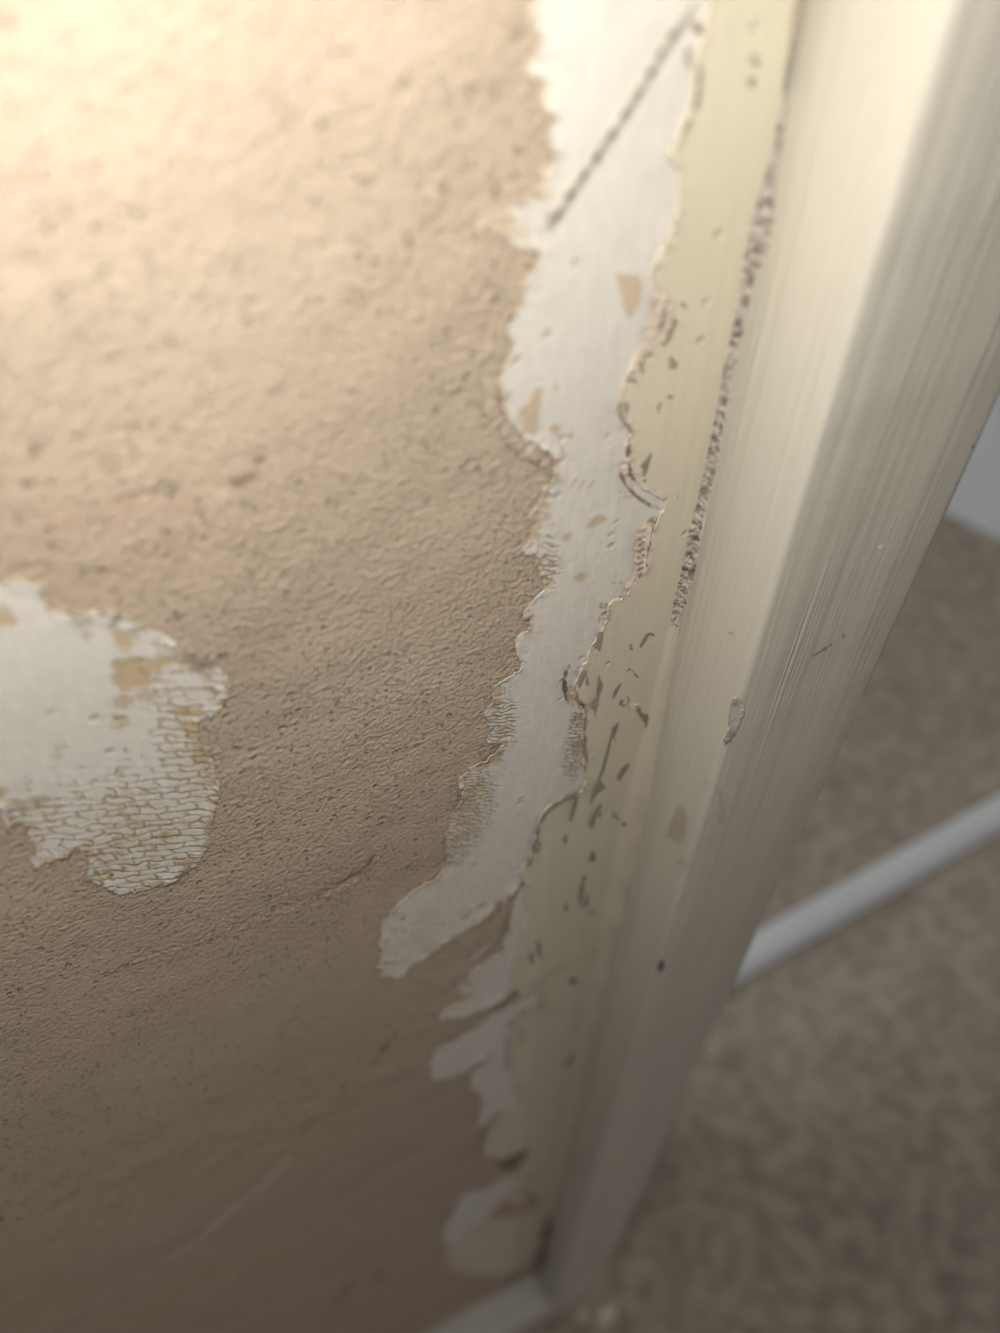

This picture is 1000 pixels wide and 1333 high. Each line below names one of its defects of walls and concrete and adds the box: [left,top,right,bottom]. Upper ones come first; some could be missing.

peeling [451,0,796,1276]